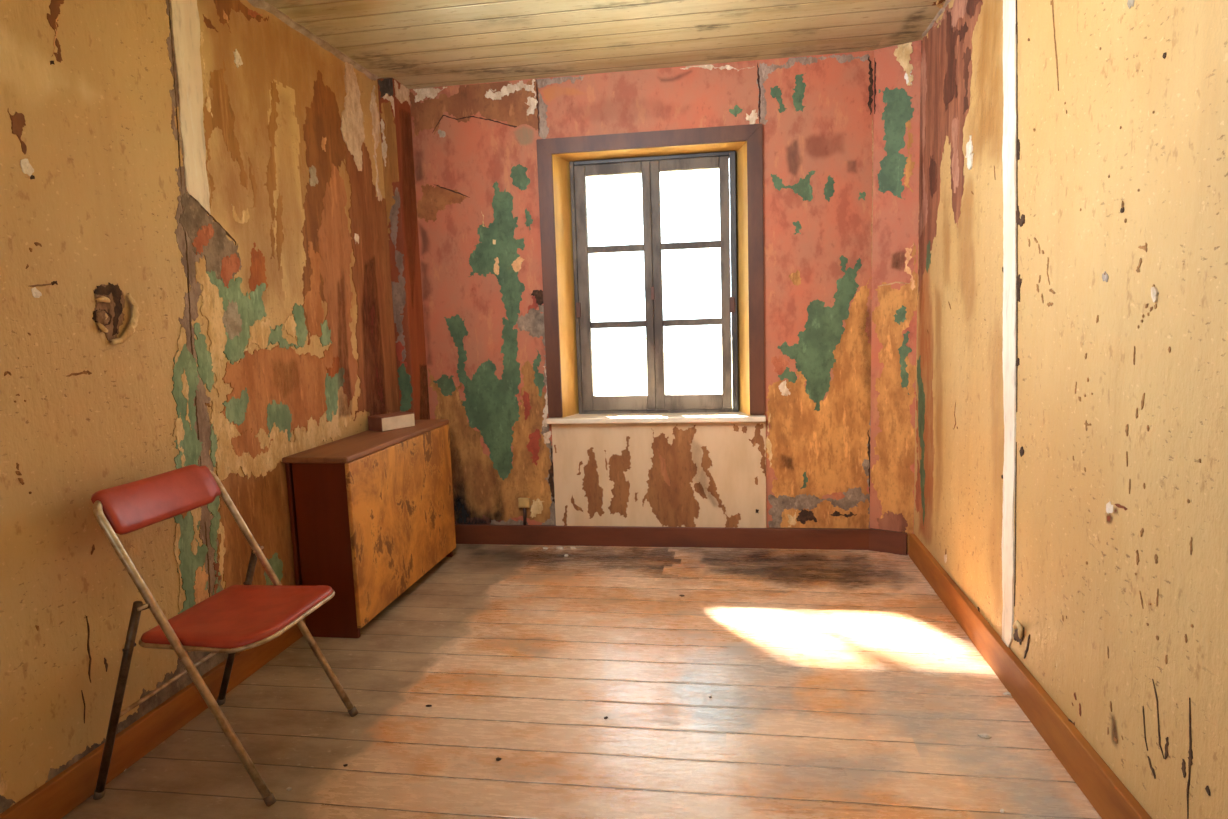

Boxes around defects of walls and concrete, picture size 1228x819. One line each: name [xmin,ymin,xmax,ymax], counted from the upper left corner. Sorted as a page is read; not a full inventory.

crack [1050,0,1059,91]
hole [92,282,139,345]
peeling [170,0,332,469]
peeling [369,75,741,528]
peeling [756,0,983,532]
flaking render [1001,0,1055,648]
peeling [325,367,345,422]
peeling [733,414,773,485]
peeling [173,496,226,614]
peeling [437,544,933,601]
crack [1135,528,1211,819]